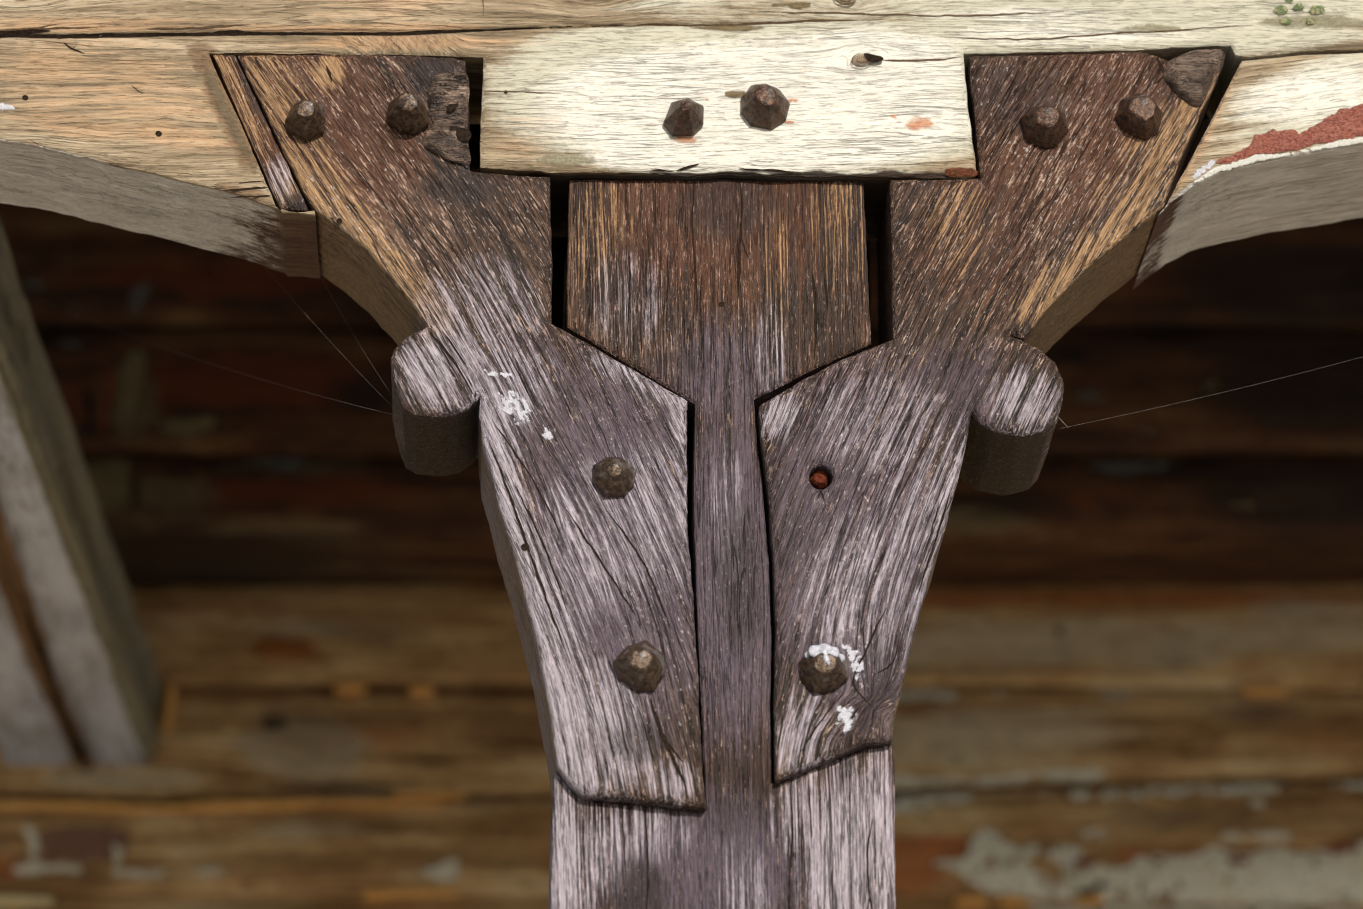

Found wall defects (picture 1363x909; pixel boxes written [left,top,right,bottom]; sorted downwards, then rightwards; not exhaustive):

peeling [1216,104,1363,164]
peeling [895,768,1282,813]
peeling [934,827,1363,908]